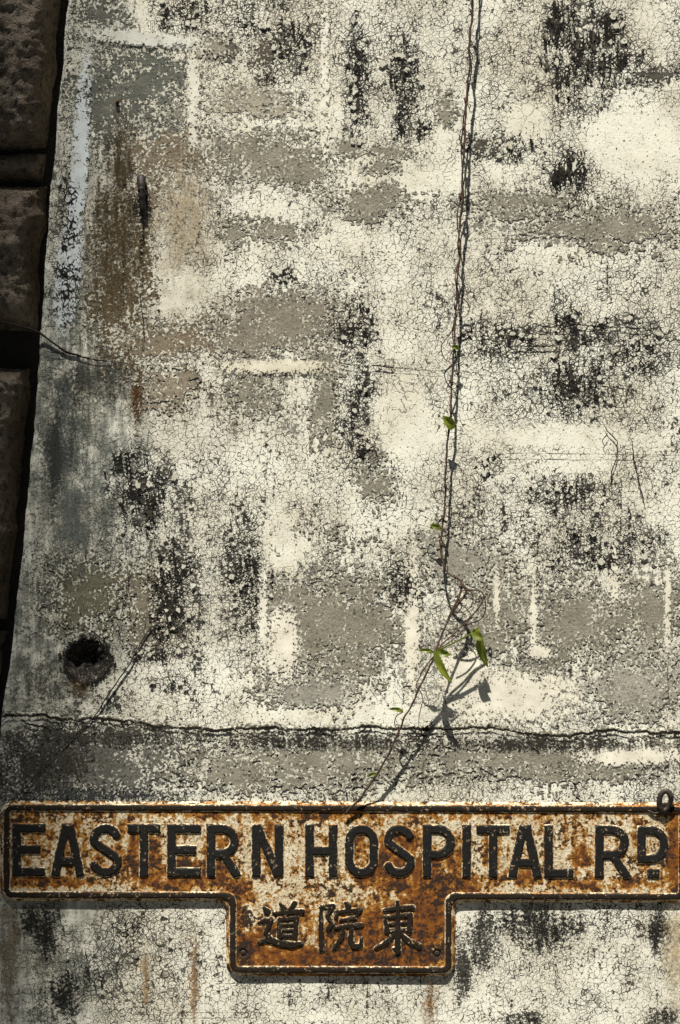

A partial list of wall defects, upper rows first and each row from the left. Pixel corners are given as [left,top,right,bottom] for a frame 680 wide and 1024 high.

peeling [0,0,680,803]
crack [0,648,680,745]